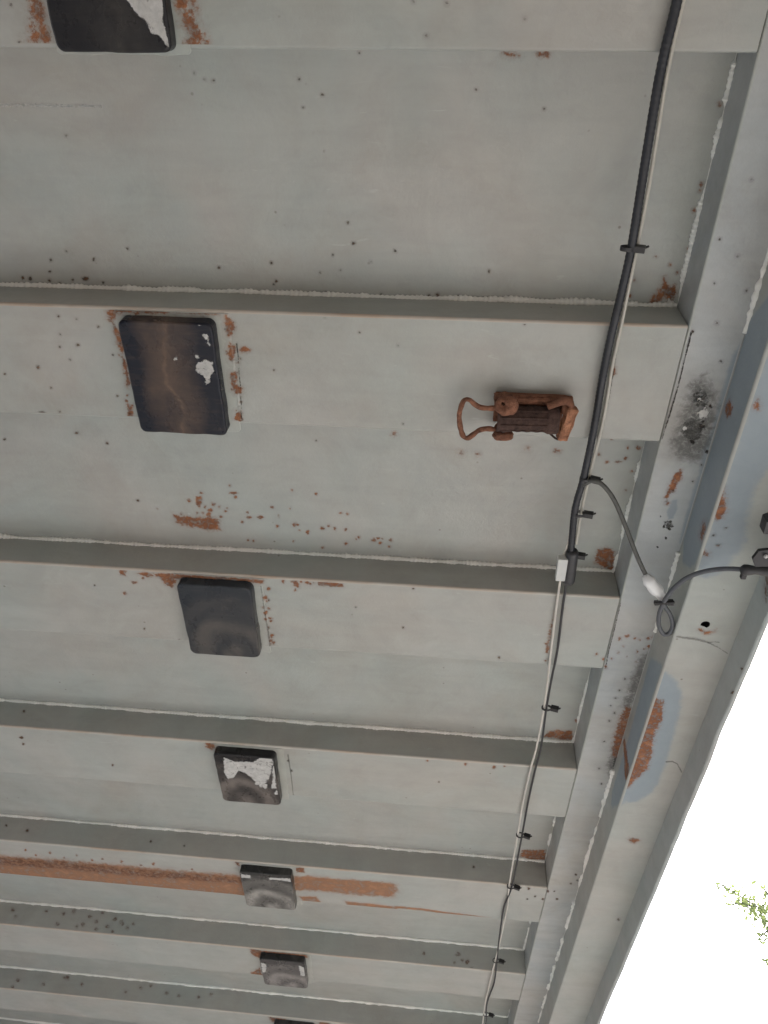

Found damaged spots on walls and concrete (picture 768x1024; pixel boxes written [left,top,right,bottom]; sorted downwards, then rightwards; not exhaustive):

rust [10,0,56,43]
rust [171,0,224,45]
rust [624,244,689,304]
rust [97,309,254,422]
rust [660,466,693,506]
rust [154,483,394,551]
rust [589,542,618,570]
rust [116,570,346,646]
rust [540,718,577,741]
rust [598,678,673,791]
rust [0,847,245,896]
rust [515,847,547,860]